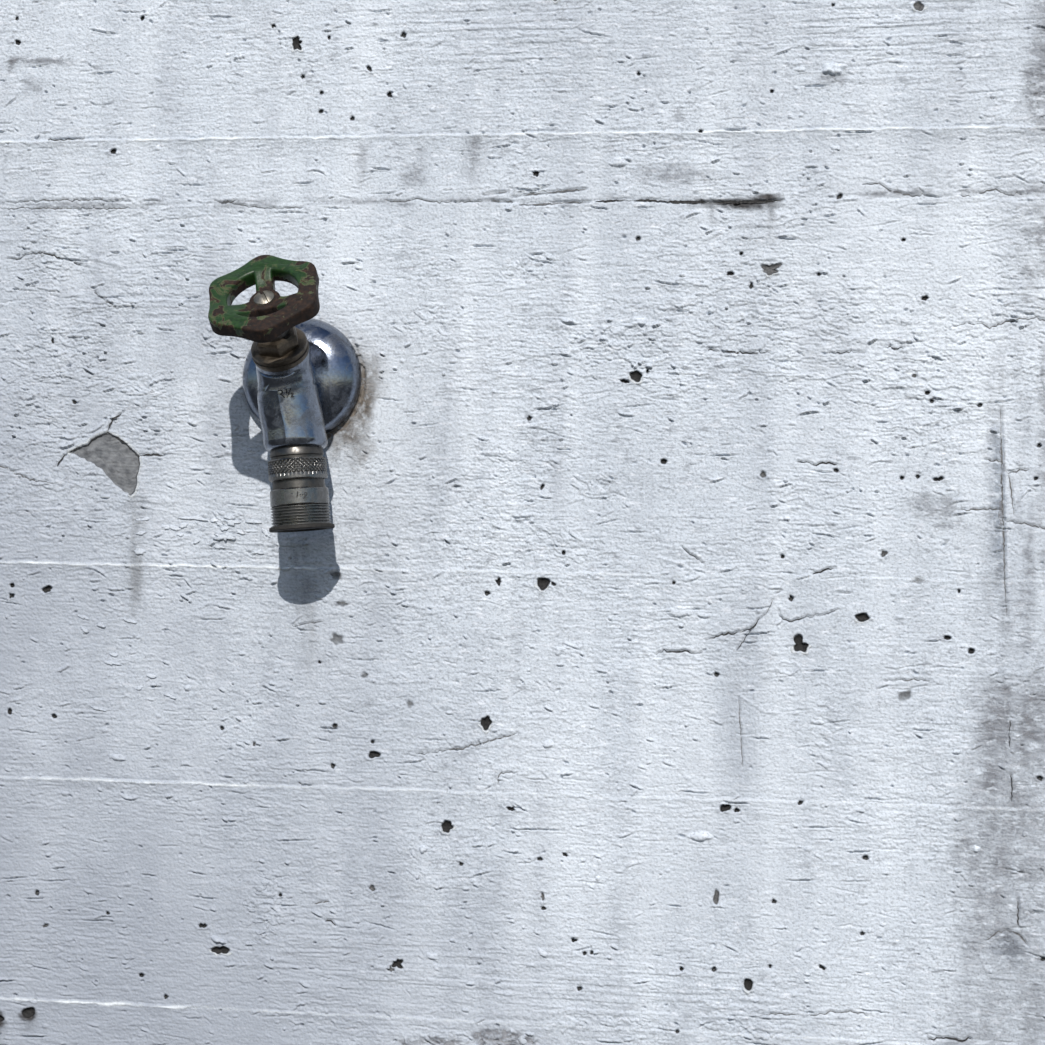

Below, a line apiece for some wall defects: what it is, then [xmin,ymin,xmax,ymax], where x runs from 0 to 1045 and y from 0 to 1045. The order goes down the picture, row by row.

crack [390,189,781,205]
spalling [57,414,163,498]
crack [964,410,1045,612]
crack [656,568,842,655]
peeling [473,1029,534,1045]